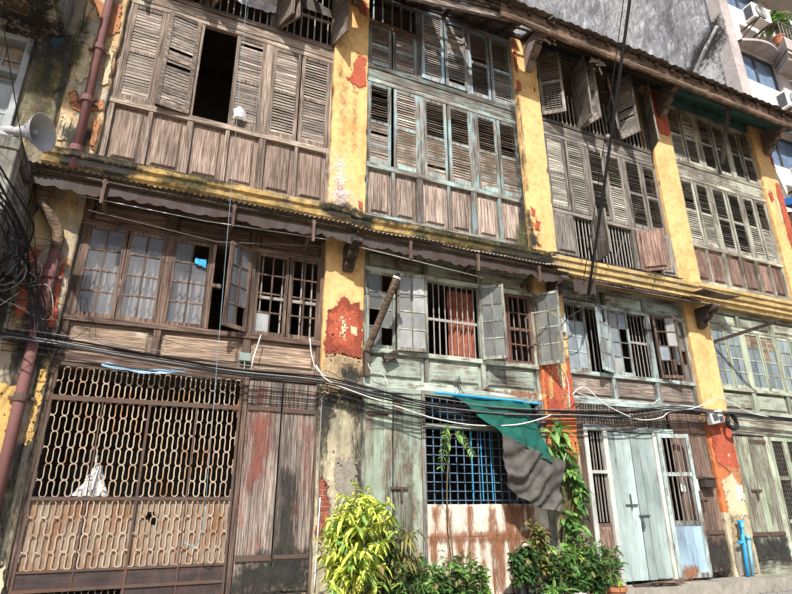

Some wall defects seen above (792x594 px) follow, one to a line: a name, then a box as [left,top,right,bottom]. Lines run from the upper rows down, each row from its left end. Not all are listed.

damp [0,0,77,126]
peeling [56,0,122,150]
damp [157,174,206,190]
damp [328,206,374,229]
peeling [321,296,364,400]
peeling [0,383,17,452]
peeling [19,366,48,445]
damp [304,385,366,498]
damp [230,465,313,594]
spalling [314,449,358,551]
rust [430,504,552,592]
peeling [707,423,759,577]